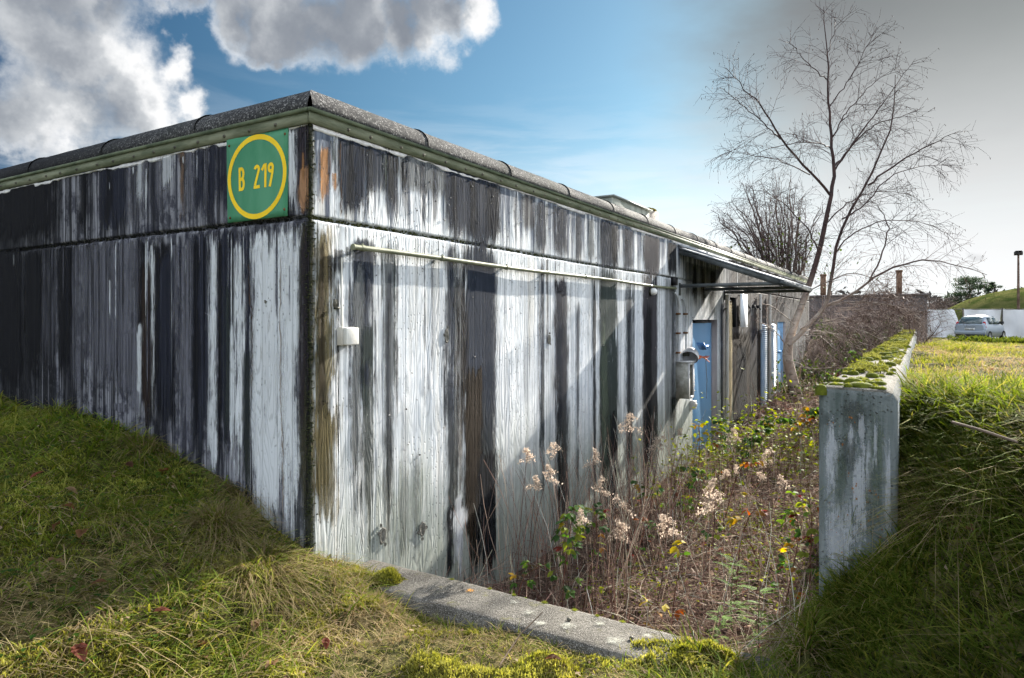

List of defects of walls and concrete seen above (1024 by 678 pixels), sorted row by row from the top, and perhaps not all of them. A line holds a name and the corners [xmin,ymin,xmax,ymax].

water stain [0,178,77,400]
water stain [100,163,134,231]
water stain [133,239,177,430]
water stain [187,142,252,498]
rust [294,126,337,211]
water stain [287,131,500,583]
water stain [534,200,677,527]
water stain [843,400,884,508]